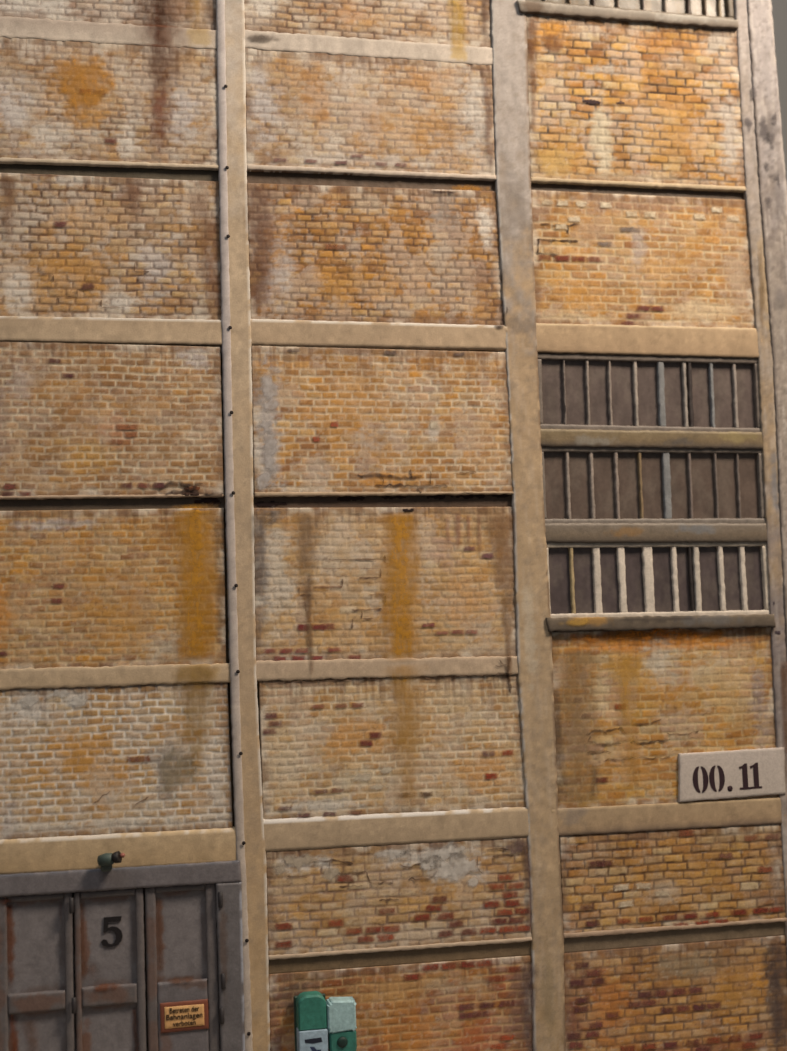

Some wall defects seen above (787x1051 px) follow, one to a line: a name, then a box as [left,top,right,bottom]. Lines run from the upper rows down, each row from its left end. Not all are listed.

corrosion [153,0,172,136]
crack [357,469,476,493]
crack [586,719,699,761]
peeling [377,843,530,937]